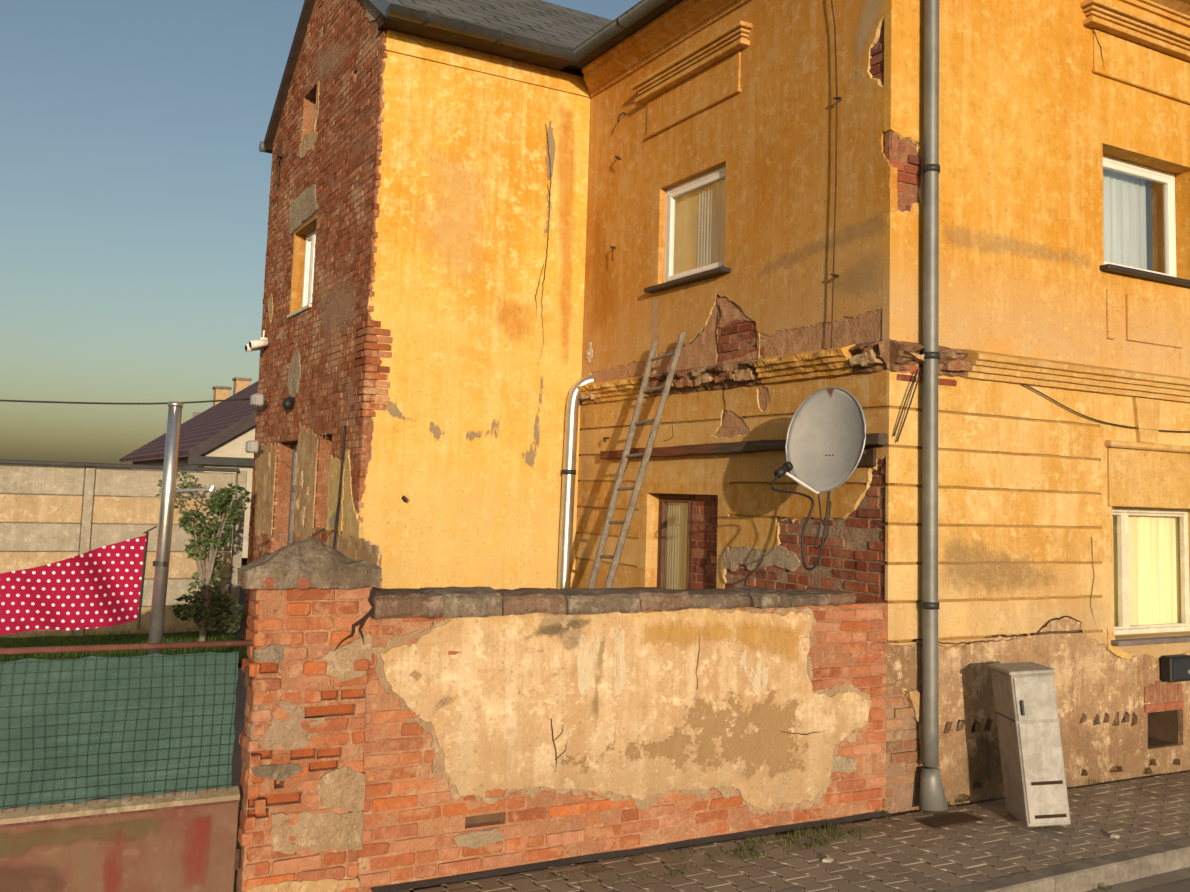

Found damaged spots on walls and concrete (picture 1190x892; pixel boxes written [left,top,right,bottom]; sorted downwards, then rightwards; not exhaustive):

flaking render [867,16,884,88]
flaking render [883,129,923,213]
crack [535,124,553,364]
flaking render [579,293,925,412]
peeling [711,409,750,439]
peeling [296,471,310,527]
flaking render [711,455,894,603]
crack [334,589,375,651]
spalling [290,747,339,772]
spalling [305,688,363,716]
flaking render [885,640,923,814]
flaking render [937,618,1190,806]